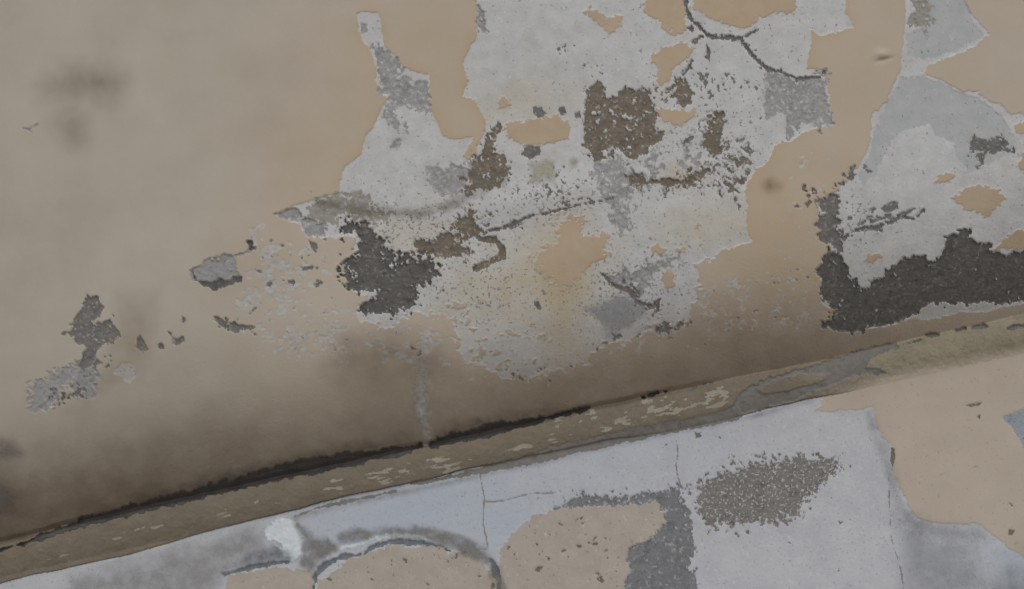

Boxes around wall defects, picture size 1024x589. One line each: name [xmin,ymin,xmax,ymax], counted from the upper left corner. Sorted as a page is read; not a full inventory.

crack [679,0,826,83]
peeling [190,0,1024,387]
flaking render [25,294,137,414]
leakage [0,375,590,552]
peeling [0,343,1024,589]
leakage [409,407,743,486]
leakage [152,489,503,589]